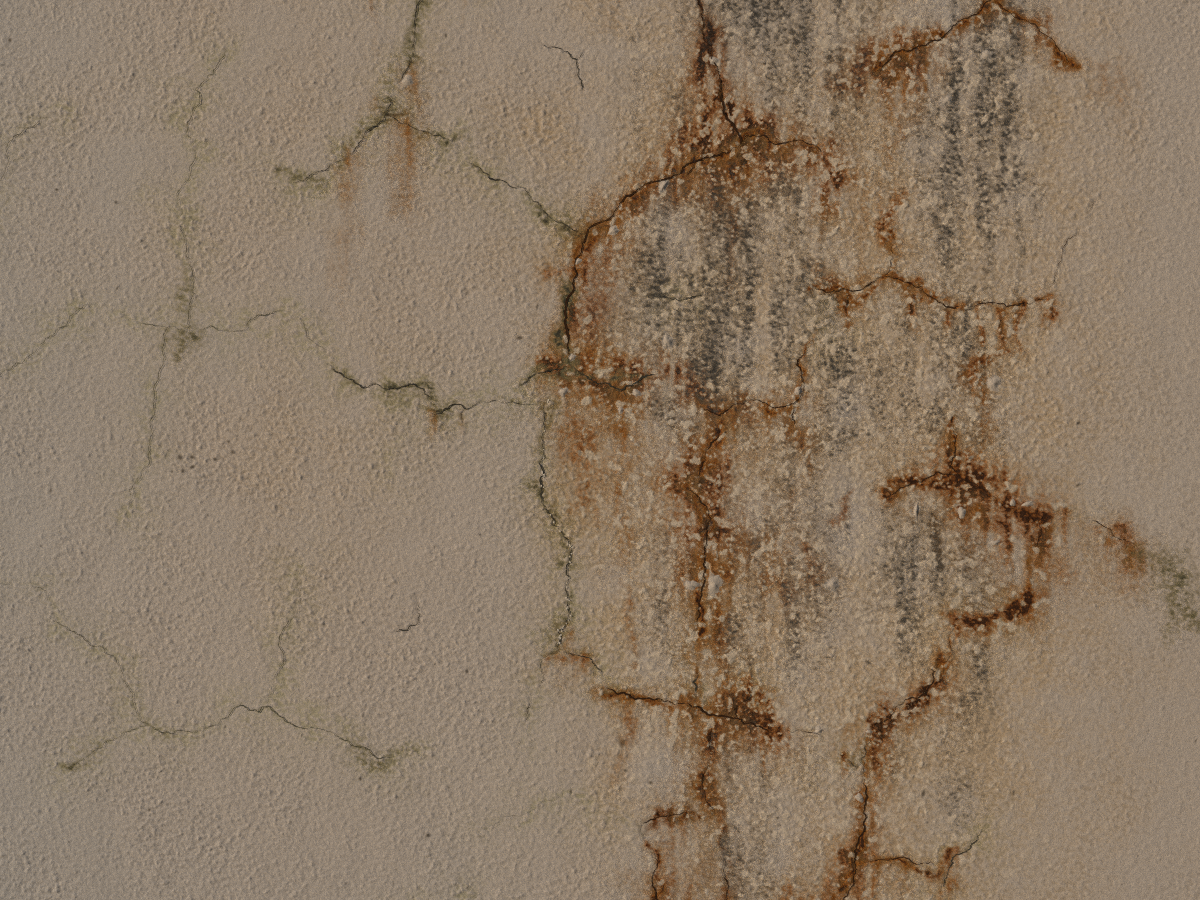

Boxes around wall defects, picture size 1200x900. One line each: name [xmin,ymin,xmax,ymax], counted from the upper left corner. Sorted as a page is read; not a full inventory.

damp [709,0,811,108]
rust [826,0,1081,97]
crack [873,0,1080,72]
damp [945,1,1022,239]
crack [129,0,821,900]
rust [536,0,857,832]
damp [629,178,795,403]
damp [896,497,953,623]
rust [781,435,1068,900]
crack [832,606,1024,900]
crack [808,201,1095,316]
rust [964,300,1027,402]